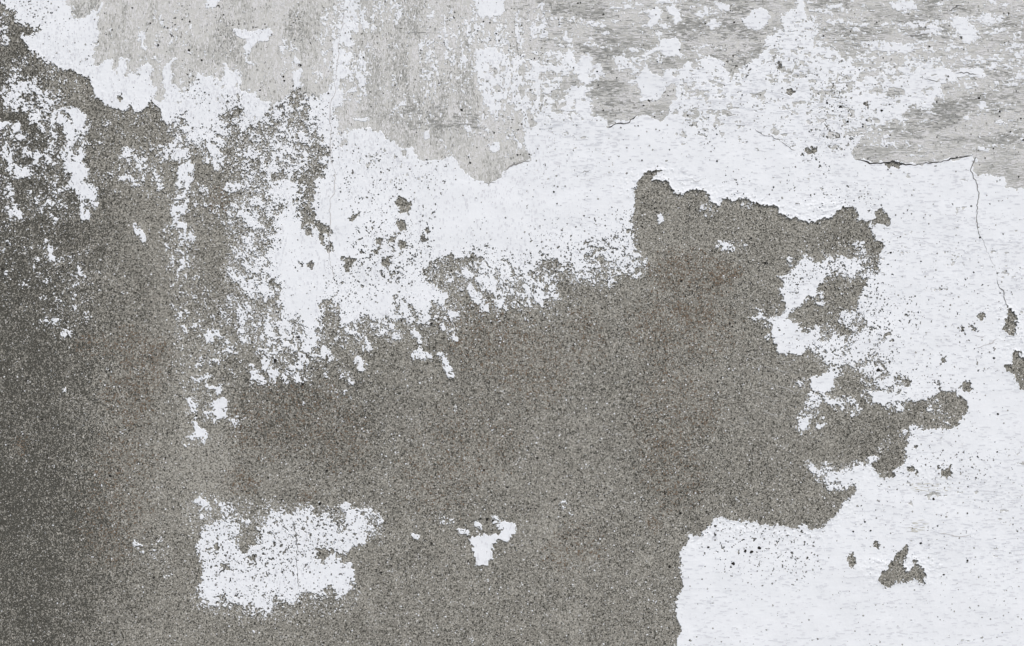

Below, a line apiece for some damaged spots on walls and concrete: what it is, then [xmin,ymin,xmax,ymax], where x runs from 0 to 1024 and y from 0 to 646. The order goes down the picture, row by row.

peeling [137,3,251,97]
peeling [310,0,753,195]
peeling [769,0,1024,169]
crack [856,148,1008,306]
peeling [999,307,1019,336]
peeling [878,544,927,589]